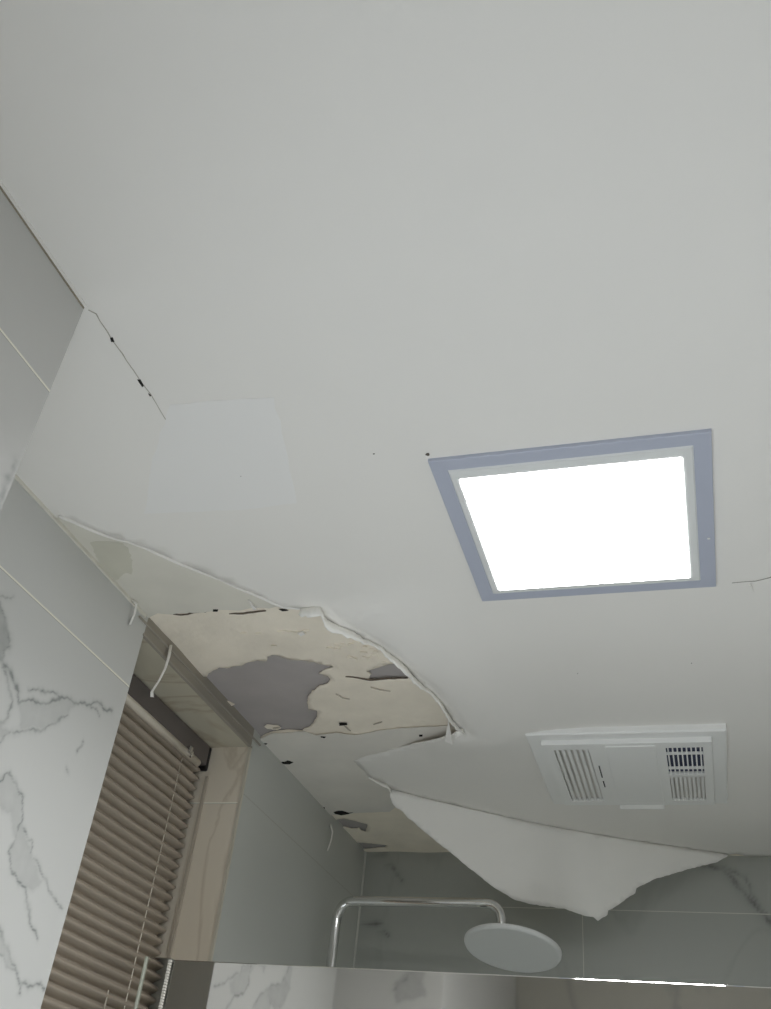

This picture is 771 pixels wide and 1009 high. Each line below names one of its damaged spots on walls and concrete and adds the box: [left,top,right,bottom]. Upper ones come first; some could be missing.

peeling [0,179,88,309]
crack [88,310,166,420]
peeling [57,517,744,921]